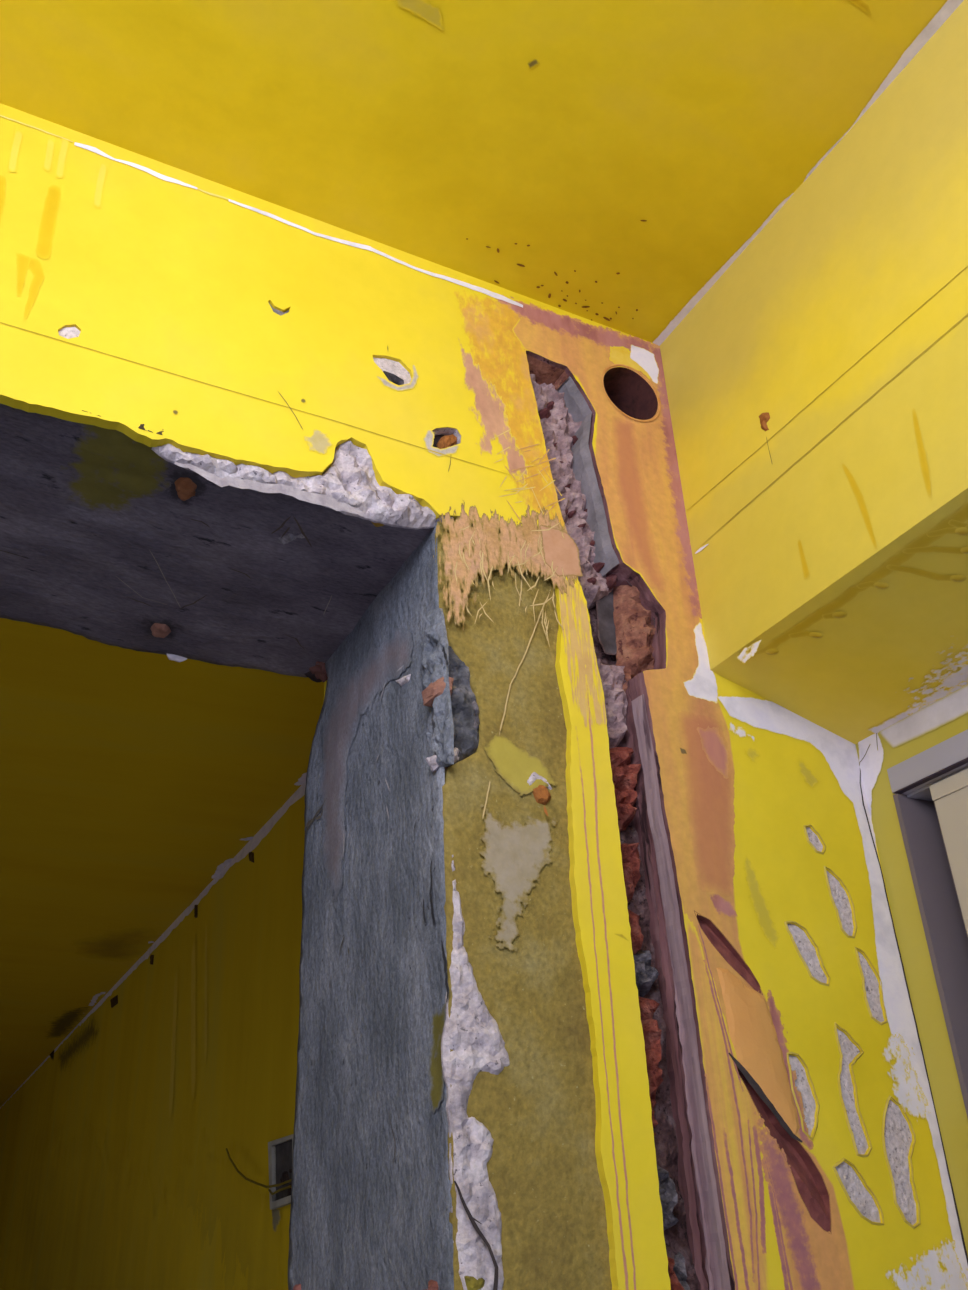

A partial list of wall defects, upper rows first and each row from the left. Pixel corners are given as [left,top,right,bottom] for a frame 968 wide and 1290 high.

leakage [16,138,69,319]
flaking render [152,427,436,529]
spalling [803,824,888,1026]
flaking render [441,855,510,1290]
flaking render [694,911,920,1234]